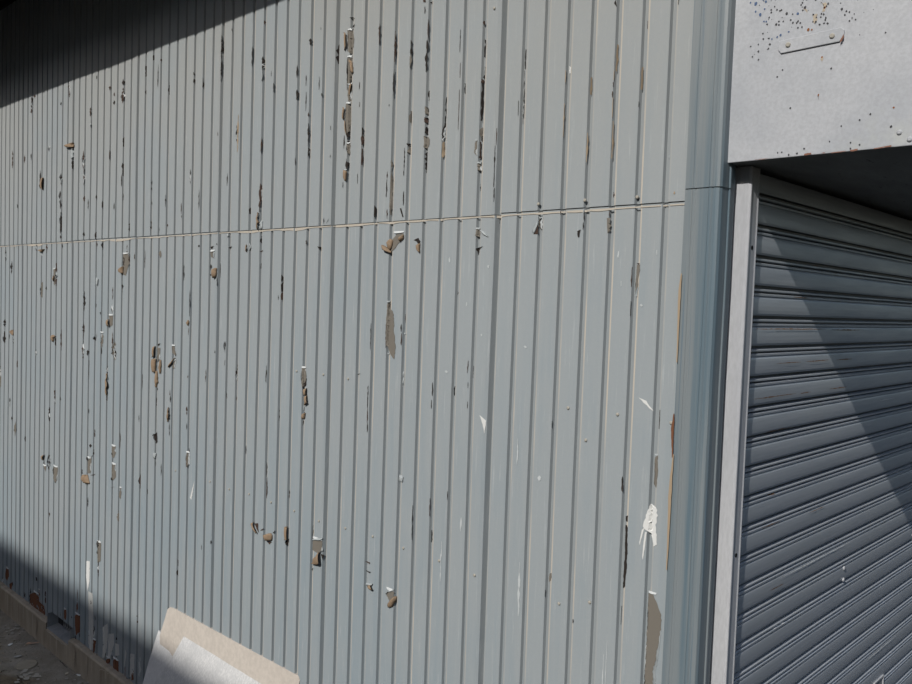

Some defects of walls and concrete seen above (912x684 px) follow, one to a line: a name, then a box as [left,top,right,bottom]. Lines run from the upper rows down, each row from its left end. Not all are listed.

peeling [344,24,355,154]
peeling [122,252,130,289]
peeling [386,302,396,359]
rust [30,592,46,615]
peeling [644,591,662,684]